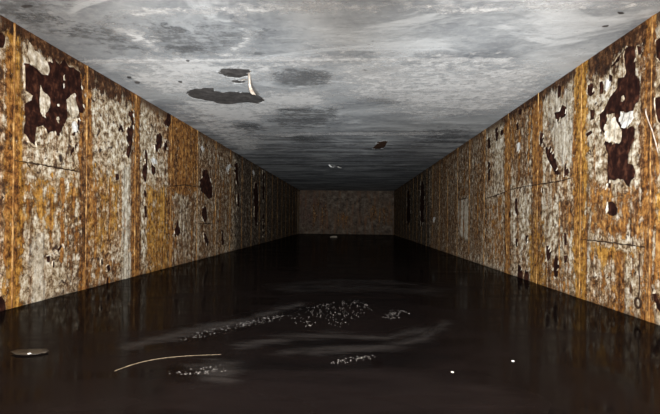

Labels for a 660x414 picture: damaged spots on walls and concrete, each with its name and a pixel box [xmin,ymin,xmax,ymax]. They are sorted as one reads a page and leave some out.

crack [15,160,79,172]
peeling [23,42,85,156]
peeling [118,108,135,159]
rust [0,15,297,310]
peeling [142,113,171,197]
leakage [71,21,574,169]
rust [394,14,660,324]
crack [486,176,573,199]
peeling [539,131,570,178]
peeling [554,105,567,124]
peeling [586,45,642,190]
crack [583,236,644,252]